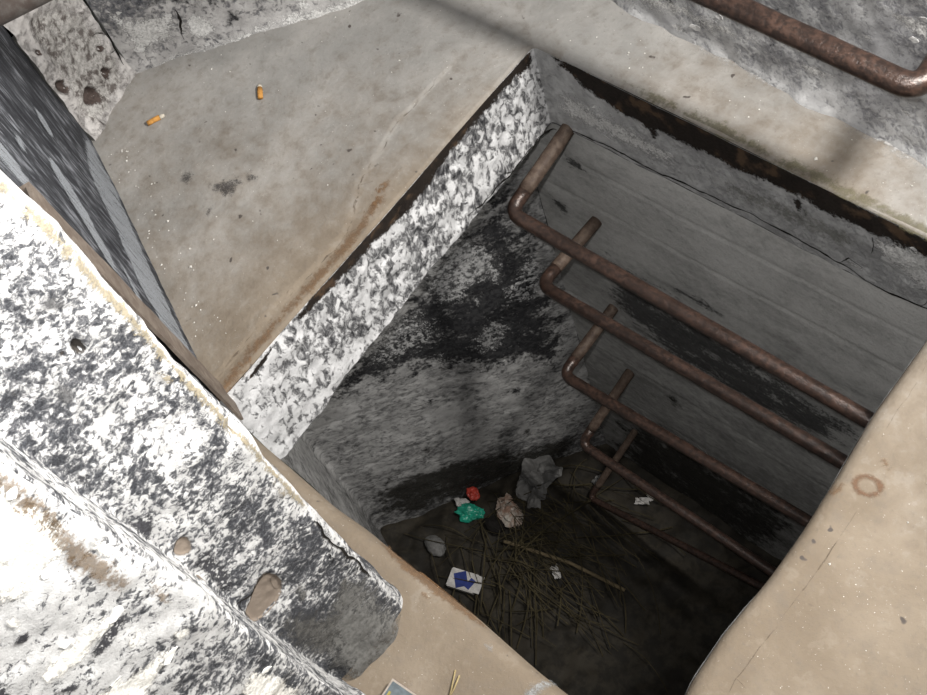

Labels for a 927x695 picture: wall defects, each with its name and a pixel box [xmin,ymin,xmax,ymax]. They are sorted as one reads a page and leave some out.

water stain [297,50,532,319]
crack [469,129,927,309]
water stain [248,348,272,381]
corrosion [853,476,883,496]
peeling [129,514,154,540]
peeling [174,537,232,600]
spalling [245,573,282,621]